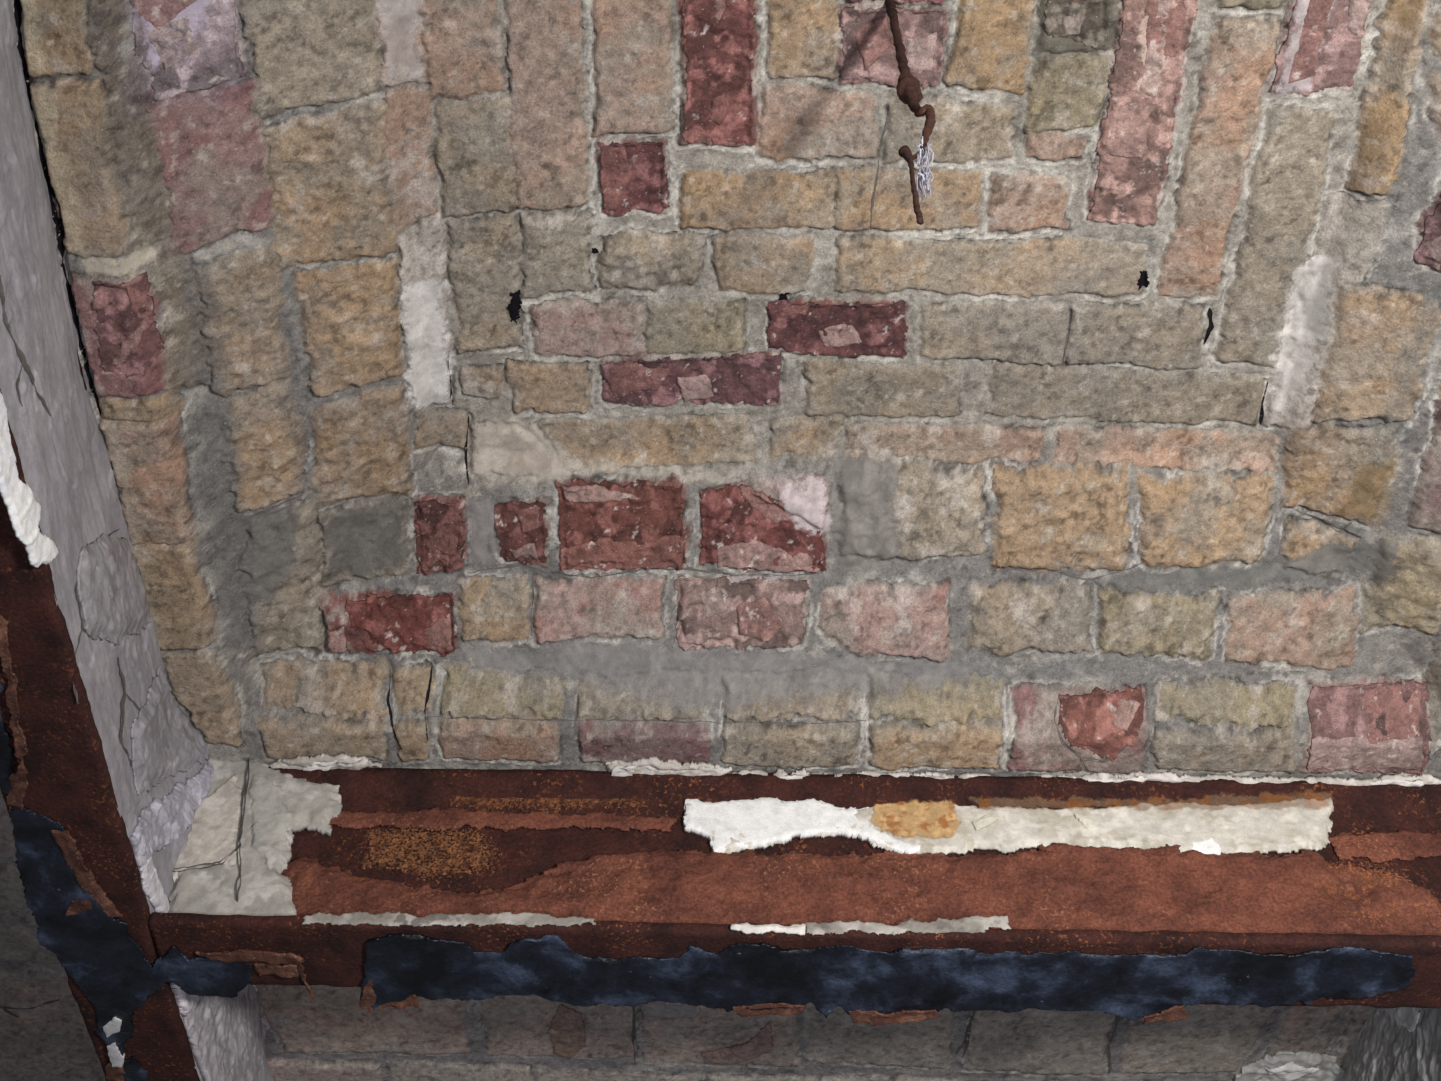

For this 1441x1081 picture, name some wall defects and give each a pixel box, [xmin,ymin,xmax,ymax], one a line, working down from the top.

crack [14,0,101,415]
crack [0,275,52,416]
spalling [91,271,165,378]
flaking render [0,392,58,567]
peeling [0,614,315,1081]
rust [361,822,502,881]
rust [450,796,653,813]
rust [871,800,961,838]
rust [1314,860,1441,926]
peeling [359,933,1441,1081]